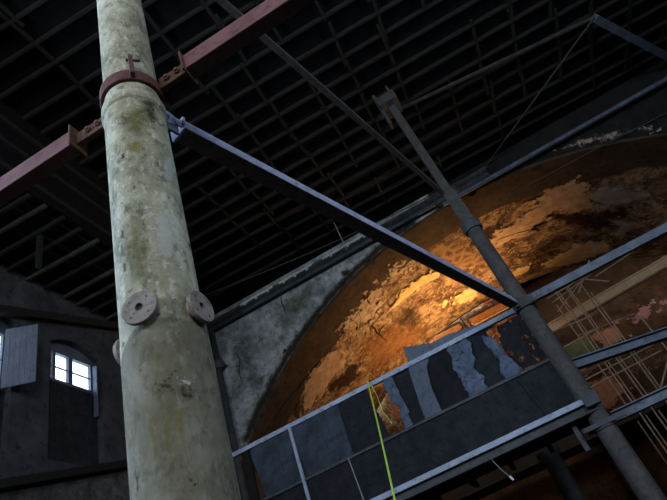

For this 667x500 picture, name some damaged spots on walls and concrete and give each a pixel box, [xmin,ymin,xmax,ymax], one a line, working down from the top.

flaking render [485,175,662,268]
peeling [322,235,366,259]
peeling [430,239,489,268]
flaking render [511,263,532,277]
flaking render [335,260,440,338]
flaking render [439,287,478,308]
flaking render [587,299,667,347]
flaking render [293,349,361,419]
flaking render [579,345,667,410]